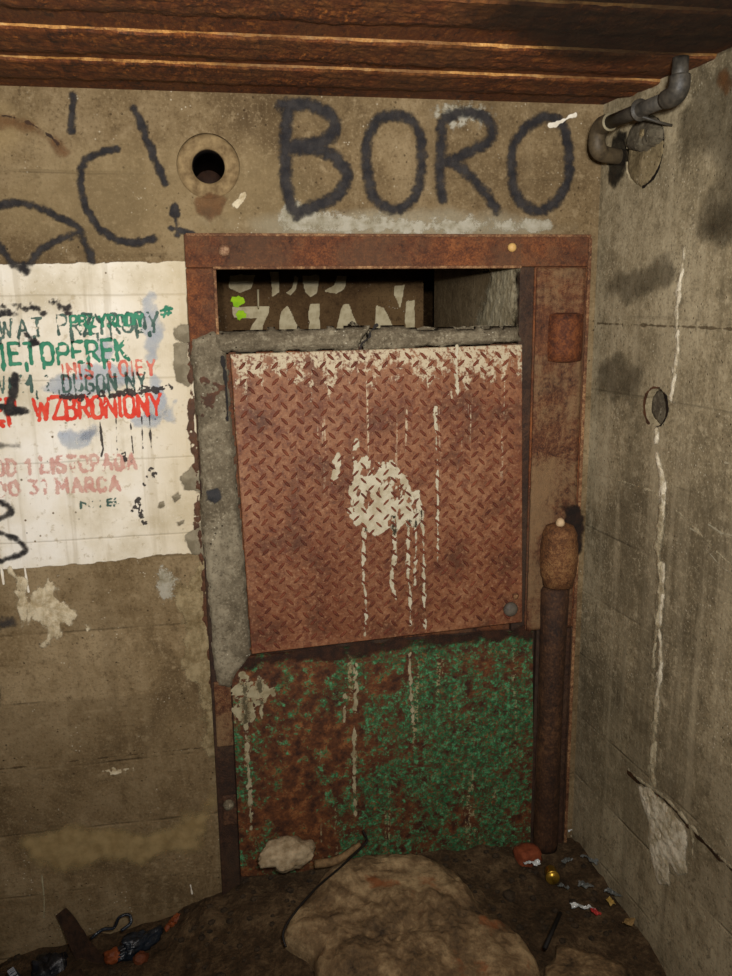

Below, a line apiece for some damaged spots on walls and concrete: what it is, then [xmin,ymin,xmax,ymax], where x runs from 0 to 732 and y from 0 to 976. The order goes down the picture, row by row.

damp [669,247,686,401]
peeling [7,566,90,648]
damp [639,427,688,886]